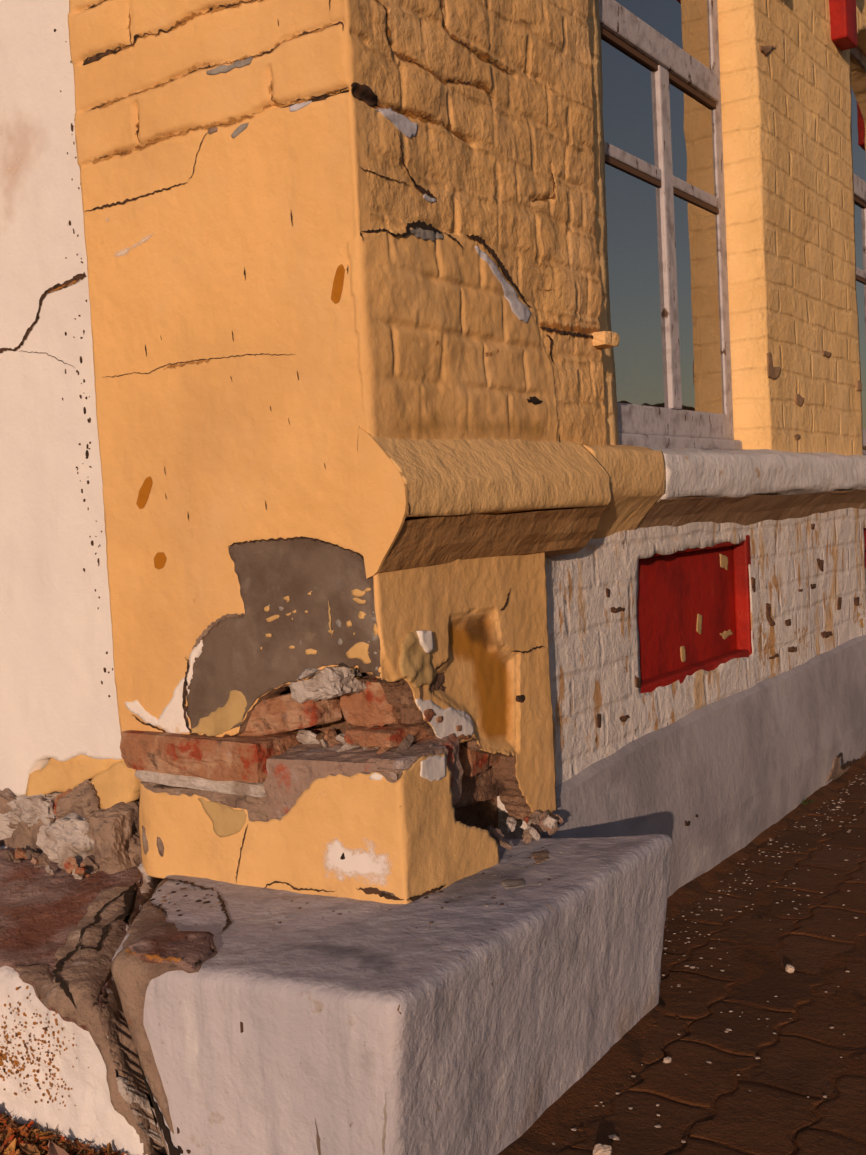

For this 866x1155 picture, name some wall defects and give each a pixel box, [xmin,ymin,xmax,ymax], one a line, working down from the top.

crack [86,132,208,211]
crack [359,107,620,363]
crack [0,273,86,369]
crack [106,353,296,377]
peeling [76,441,102,572]
spalling [0,536,576,907]
crack [264,881,446,901]
crack [52,798,248,1155]